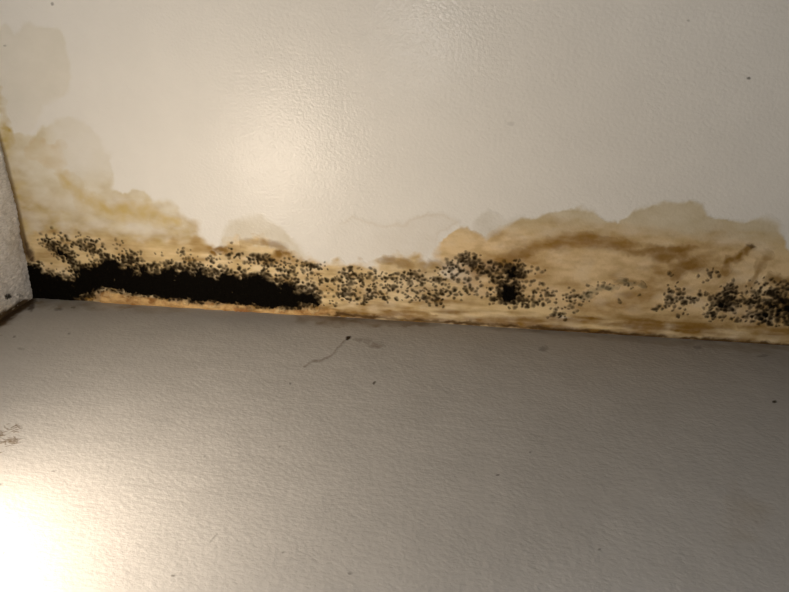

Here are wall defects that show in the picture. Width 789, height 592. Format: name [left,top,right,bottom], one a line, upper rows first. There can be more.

water stain [0,18,789,343]